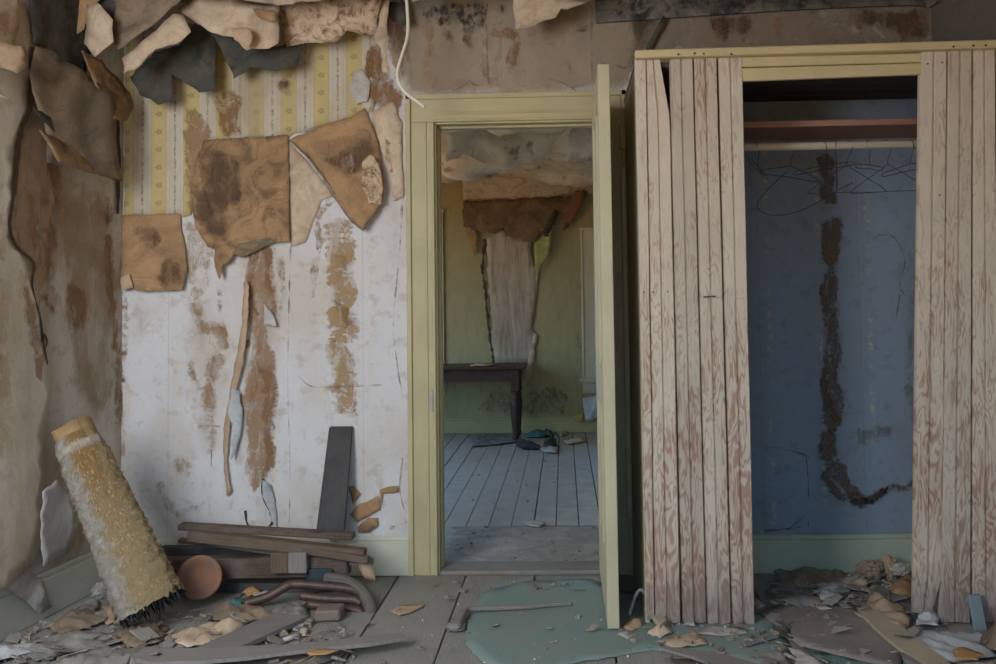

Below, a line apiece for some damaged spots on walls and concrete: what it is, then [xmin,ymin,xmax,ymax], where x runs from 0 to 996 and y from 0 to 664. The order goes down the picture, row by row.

peeling [0,0,28,73]
peeling [81,50,134,121]
peeling [33,107,117,182]
peeling [341,155,383,205]
leakage [816,154,837,204]
peeling [121,274,133,291]
peeling [214,237,275,279]
leakage [310,204,358,415]
leakage [189,304,229,408]
leakage [240,247,285,492]
leakage [819,217,913,509]